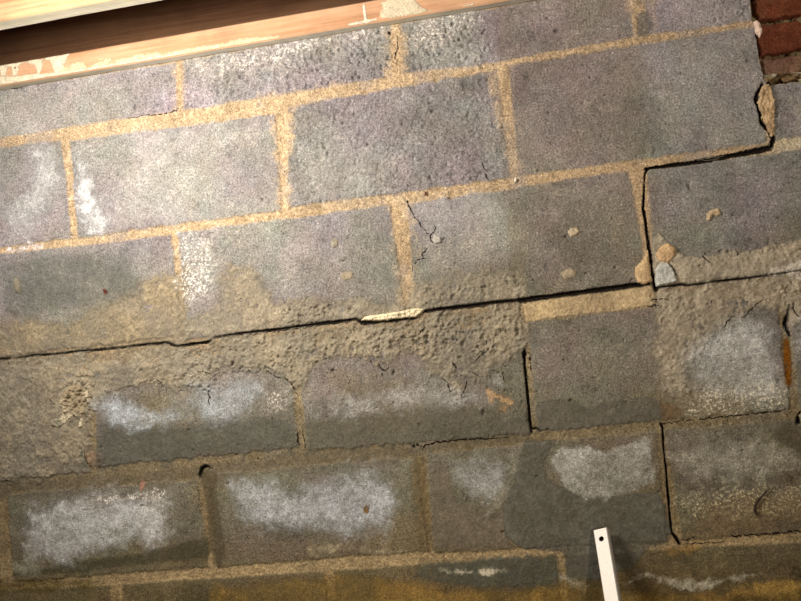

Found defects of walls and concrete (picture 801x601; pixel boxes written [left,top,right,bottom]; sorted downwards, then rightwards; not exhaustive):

crack [0,81,801,360]
peeling [655,263,677,287]
damp [12,471,225,575]
damp [94,382,295,467]
crack [412,437,508,449]
crack [441,340,504,397]
damp [307,387,681,590]
crack [522,350,541,433]
crack [659,406,801,545]
damp [690,320,787,415]
rust [783,338,792,386]
damp [639,573,746,592]